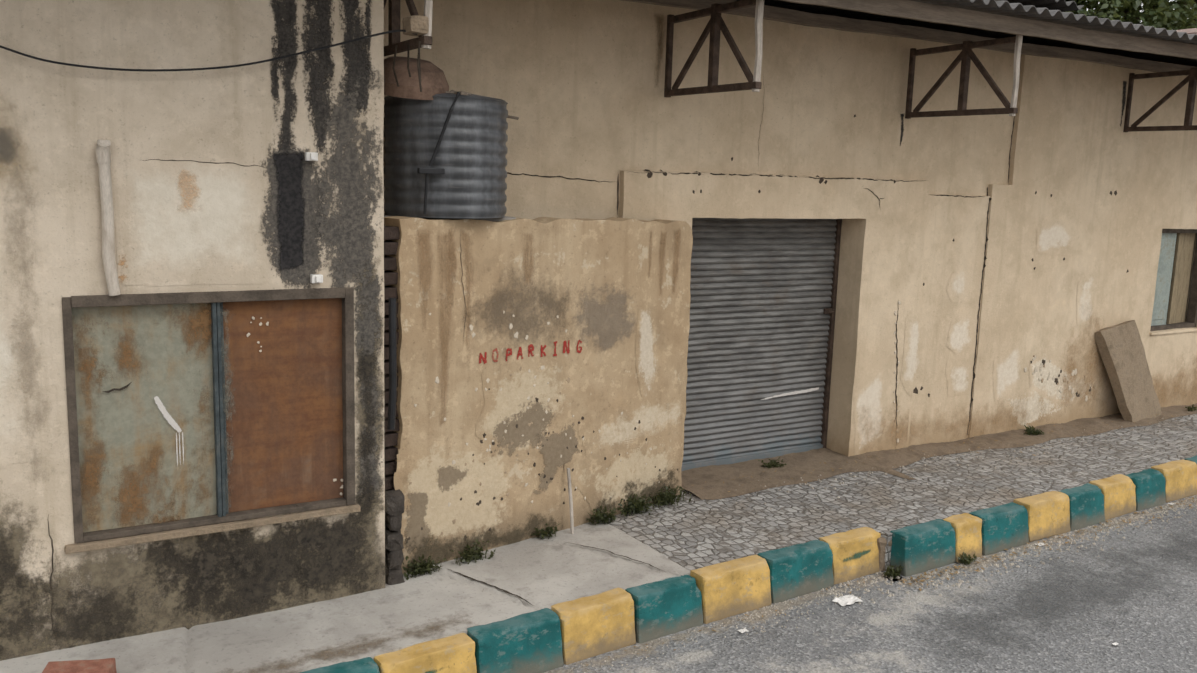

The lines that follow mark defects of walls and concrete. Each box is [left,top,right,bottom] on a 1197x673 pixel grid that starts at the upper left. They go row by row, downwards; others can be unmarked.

crack [142,159,265,168]
water stain [261,0,374,289]
crack [507,76,909,215]
crack [935,116,1015,435]
rust [114,448,179,524]
water stain [0,264,385,661]
crack [893,300,901,450]
spalling [1002,350,1096,429]